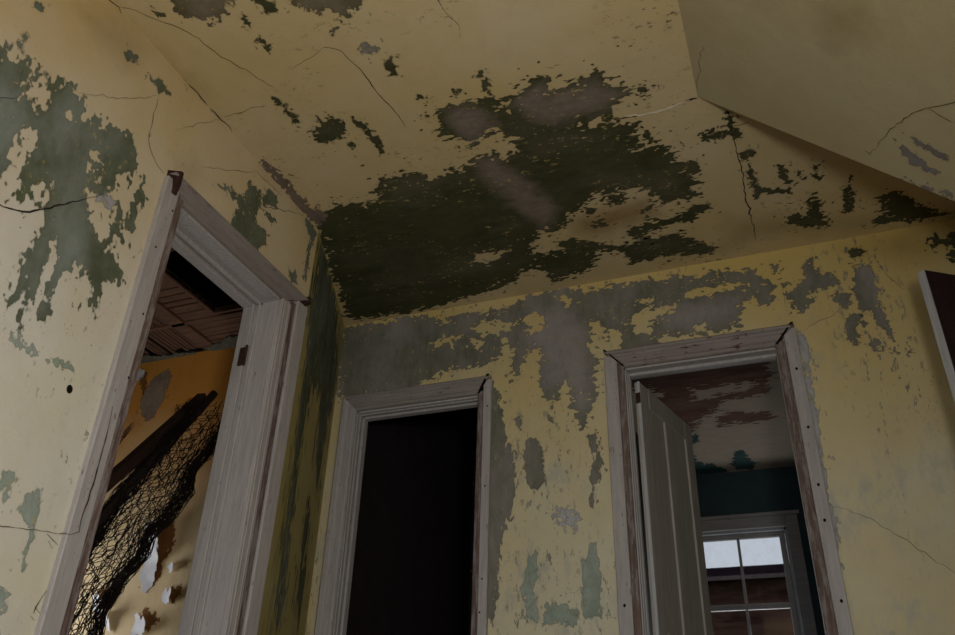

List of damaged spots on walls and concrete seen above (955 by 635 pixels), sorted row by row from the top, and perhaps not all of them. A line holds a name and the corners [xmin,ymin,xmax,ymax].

crack [0,193,104,213]
peeling [0,34,149,379]
crack [83,93,164,173]
crack [109,0,270,131]
crack [295,47,405,126]
peeling [357,42,380,55]
peeling [384,56,402,77]
crack [729,115,756,240]
peeling [738,137,955,263]
crack [866,102,955,154]
peeling [217,60,912,635]
crack [0,407,113,548]